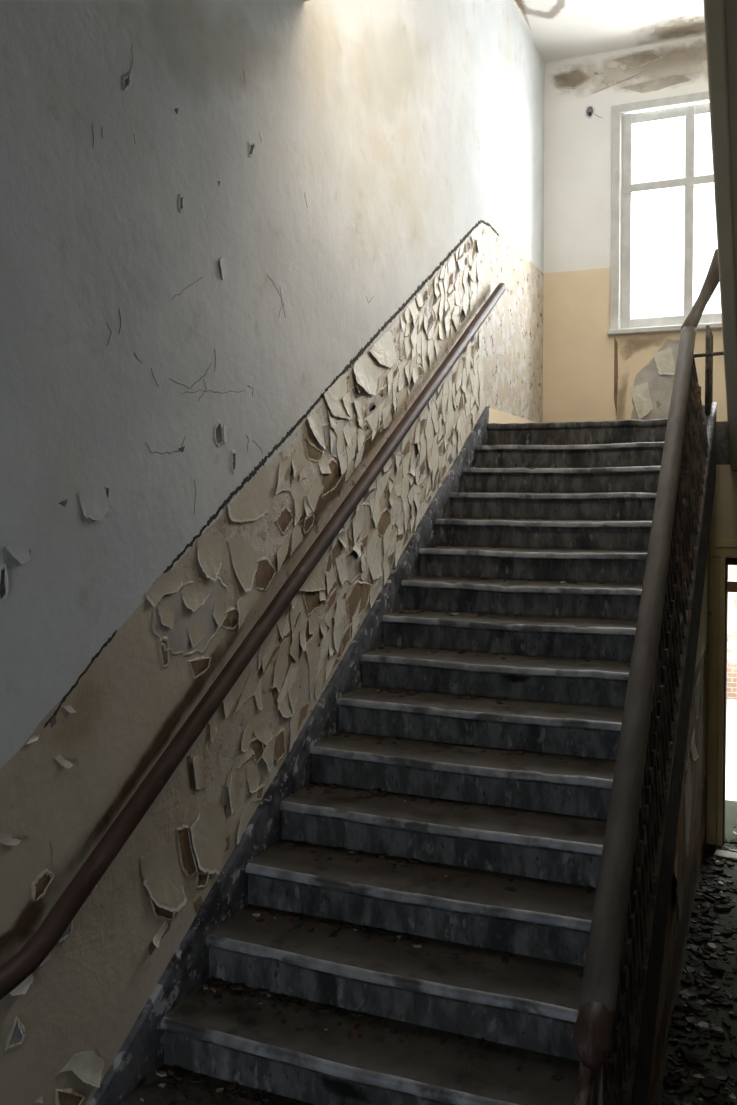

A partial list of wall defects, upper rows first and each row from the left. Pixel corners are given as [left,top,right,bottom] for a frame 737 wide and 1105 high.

peeling [554,68,591,89]
peeling [612,50,663,69]
peeling [621,74,691,93]
peeling [144,220,499,681]
peeling [140,314,492,955]
peeling [27,630,117,744]
peeling [31,842,55,902]
peeling [10,920,74,996]
peeling [35,1051,105,1105]
spalling [322,1077,367,1101]